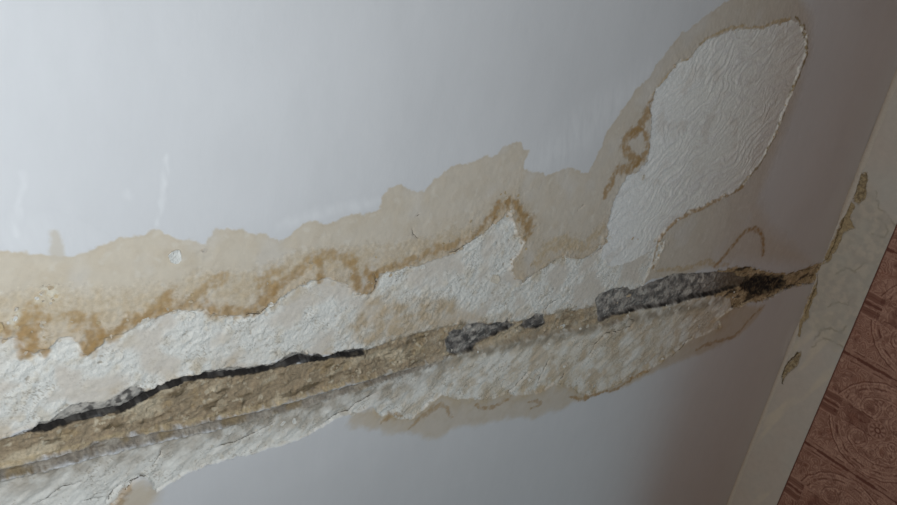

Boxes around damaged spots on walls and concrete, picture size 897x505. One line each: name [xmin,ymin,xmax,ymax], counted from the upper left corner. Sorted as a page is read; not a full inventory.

crack [0,347,366,440]
crack [246,304,270,315]
crack [328,392,375,419]
flaking render [0,300,732,505]
flaking render [0,14,809,436]
water stain [0,0,818,443]
water stain [789,180,897,358]
spalling [821,171,870,266]